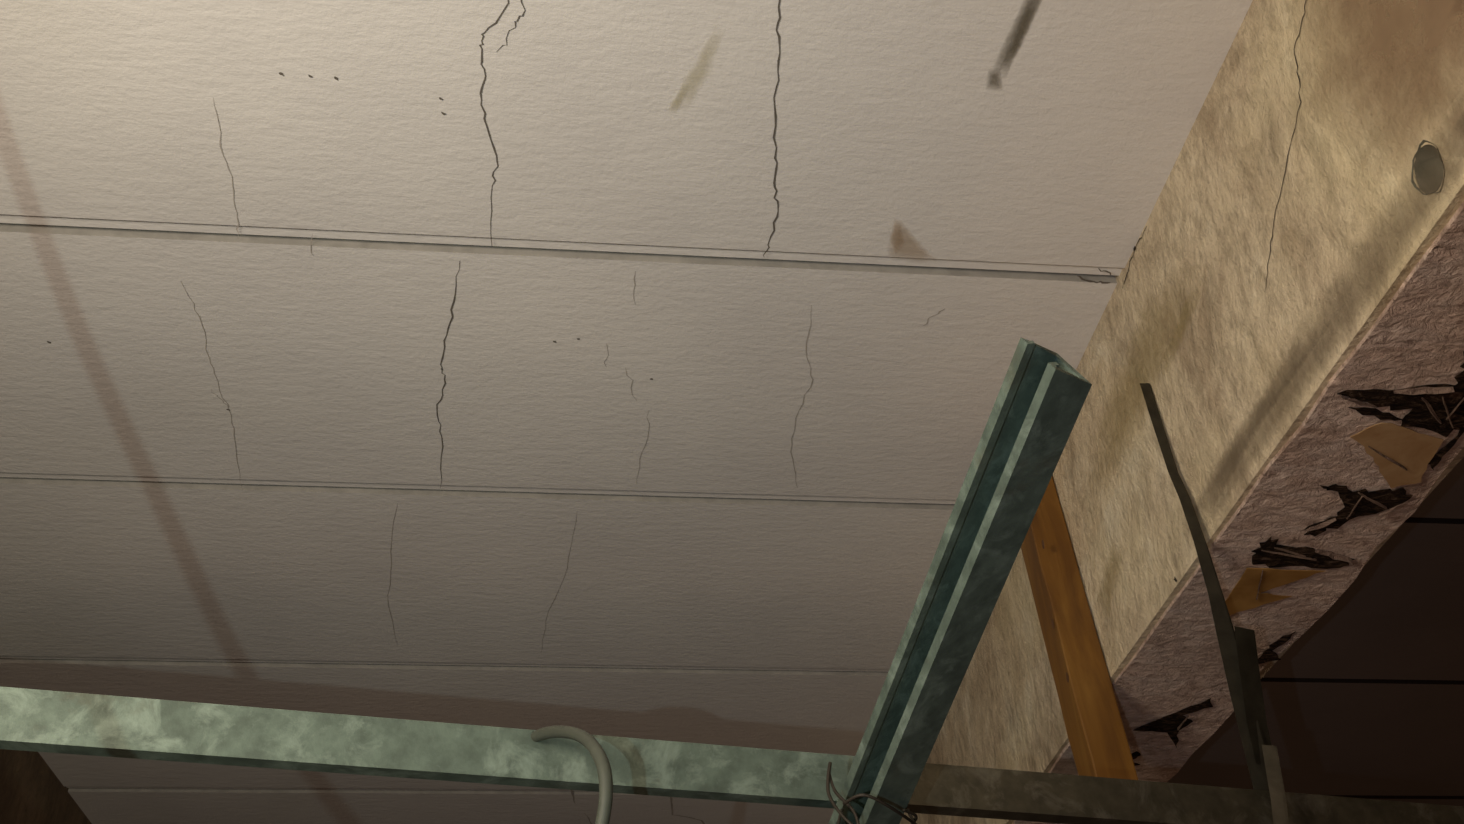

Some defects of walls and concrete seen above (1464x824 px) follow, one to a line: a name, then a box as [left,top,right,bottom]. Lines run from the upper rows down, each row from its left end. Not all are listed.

crack [479,0,525,245]
crack [763,0,781,256]
water stain [1005,2,1033,54]
crack [436,261,460,488]
peeling [1225,351,1464,615]
peeling [1133,698,1213,748]
peeling [1258,631,1296,664]